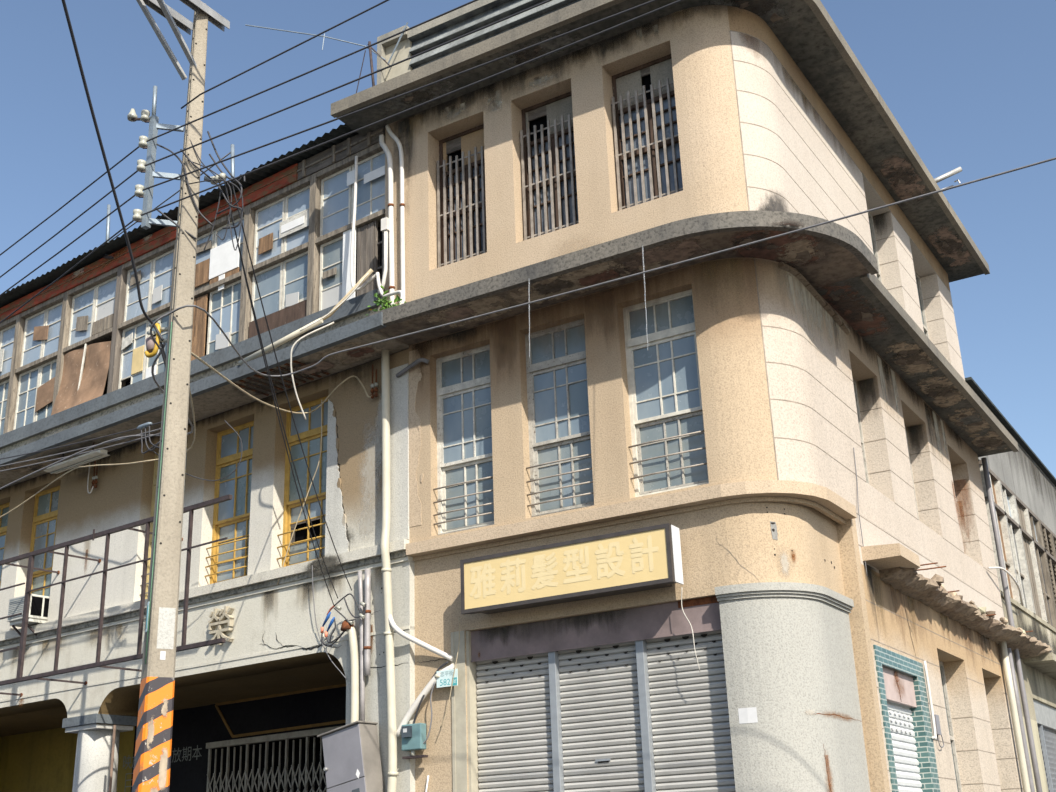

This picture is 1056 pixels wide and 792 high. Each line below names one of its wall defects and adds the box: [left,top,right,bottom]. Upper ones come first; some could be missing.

flaking render [325,399,350,556]
flaking render [409,349,424,527]
crack [262,634,340,650]
leakage [304,556,338,588]